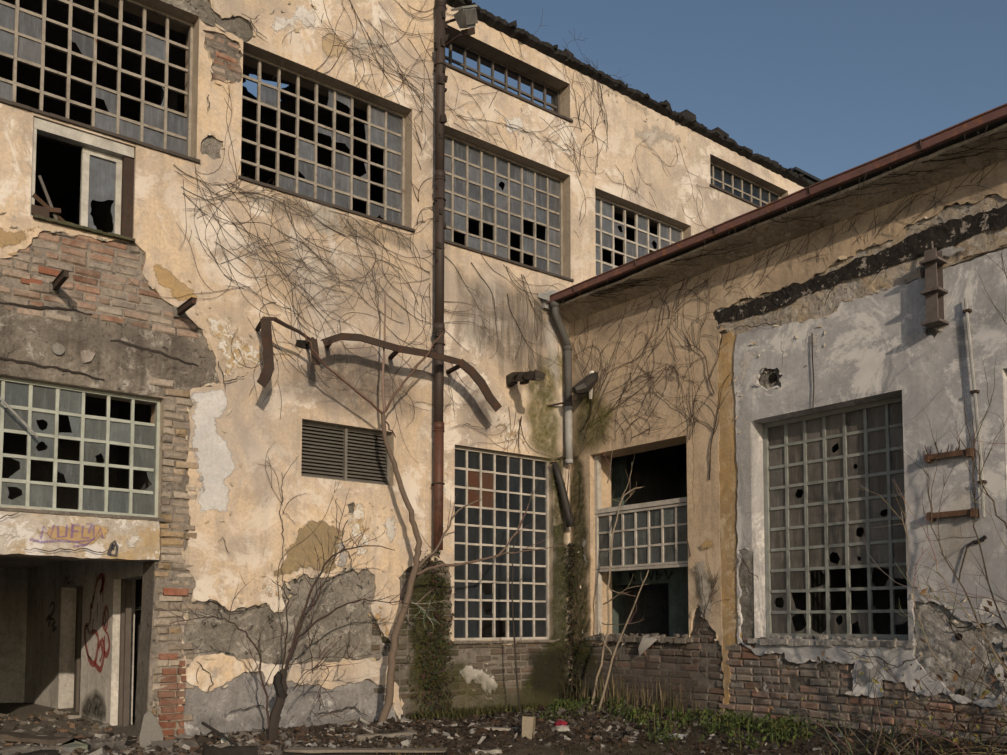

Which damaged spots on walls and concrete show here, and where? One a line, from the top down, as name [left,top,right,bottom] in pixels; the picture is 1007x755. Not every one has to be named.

flaking render [160,0,256,85]
flaking render [201,133,225,160]
flaking render [0,194,1007,746]